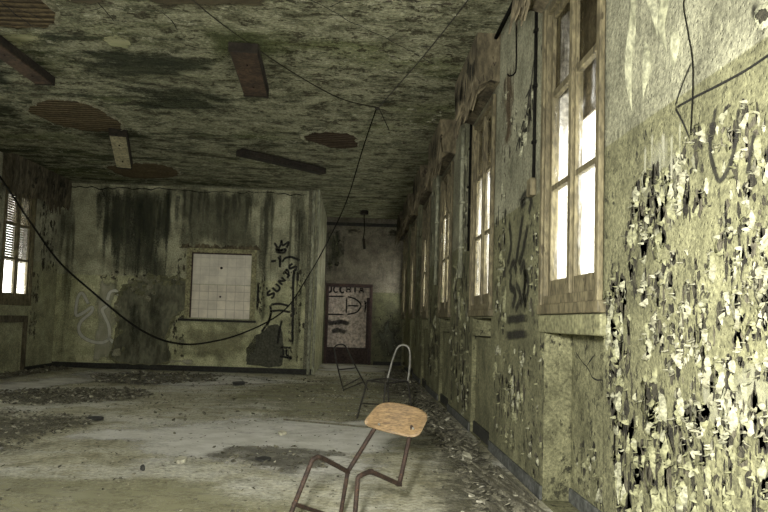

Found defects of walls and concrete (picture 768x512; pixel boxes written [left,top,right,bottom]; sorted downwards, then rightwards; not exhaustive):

water stain [148,0,266,9]
water stain [75,26,288,78]
peeling [23,97,126,133]
water stain [125,88,231,115]
water stain [97,185,252,277]
water stain [262,191,273,317]
peeling [494,71,534,334]
peeling [602,98,768,512]